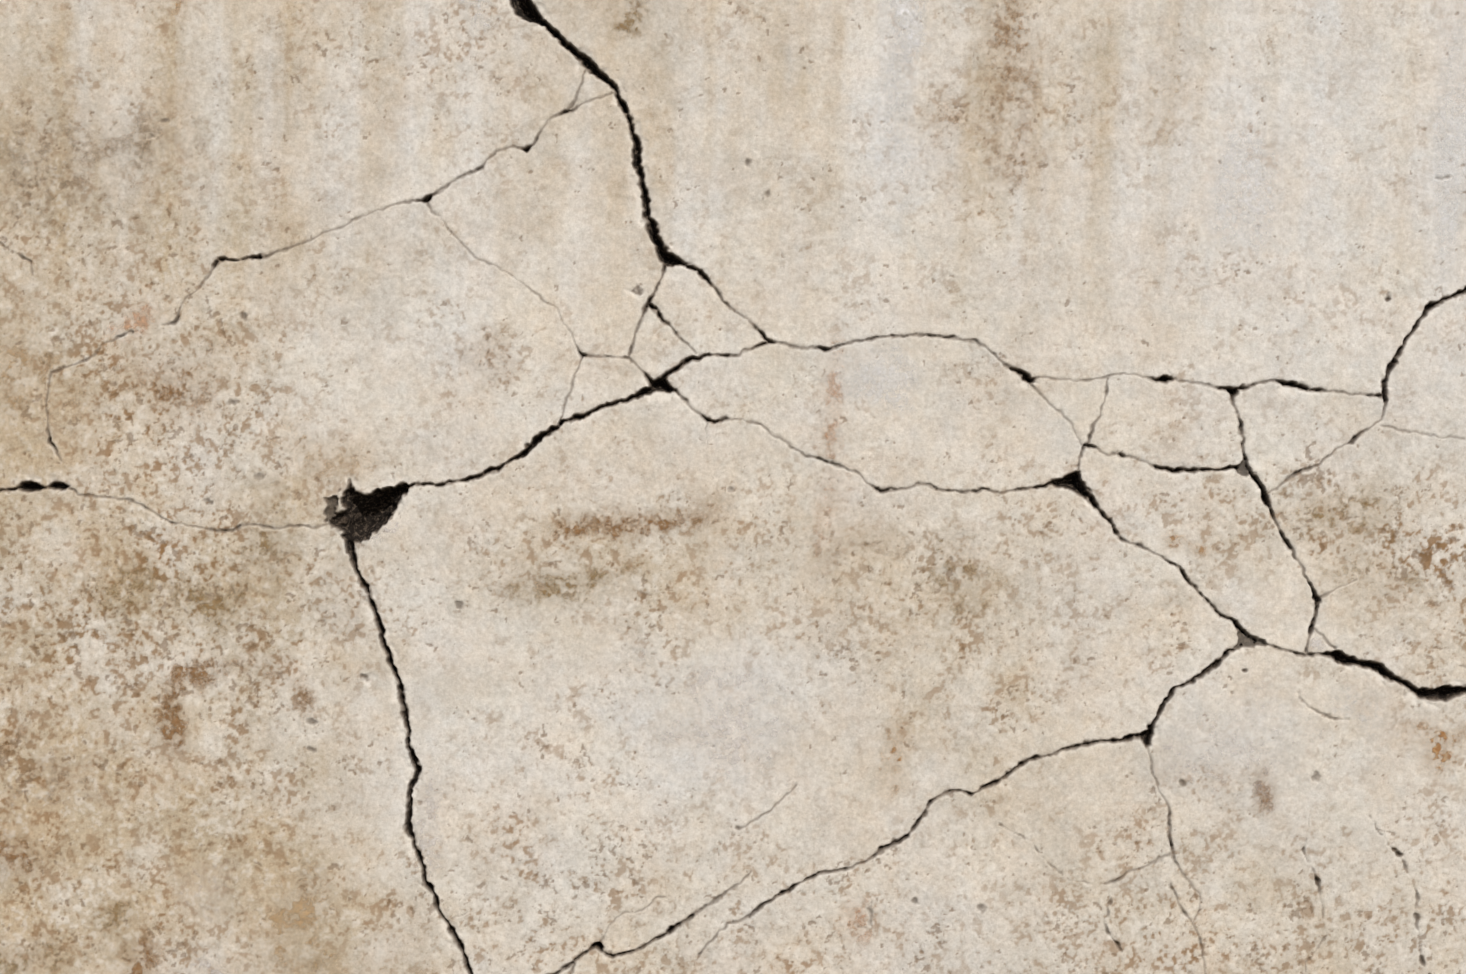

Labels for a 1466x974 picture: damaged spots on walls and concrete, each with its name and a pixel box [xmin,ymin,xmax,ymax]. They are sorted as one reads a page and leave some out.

crack [0,241,33,276]
crack [162,0,773,489]
crack [1435,173,1451,181]
crack [0,329,328,534]
crack [696,285,1466,974]
crack [348,545,474,974]
crack [545,870,752,974]